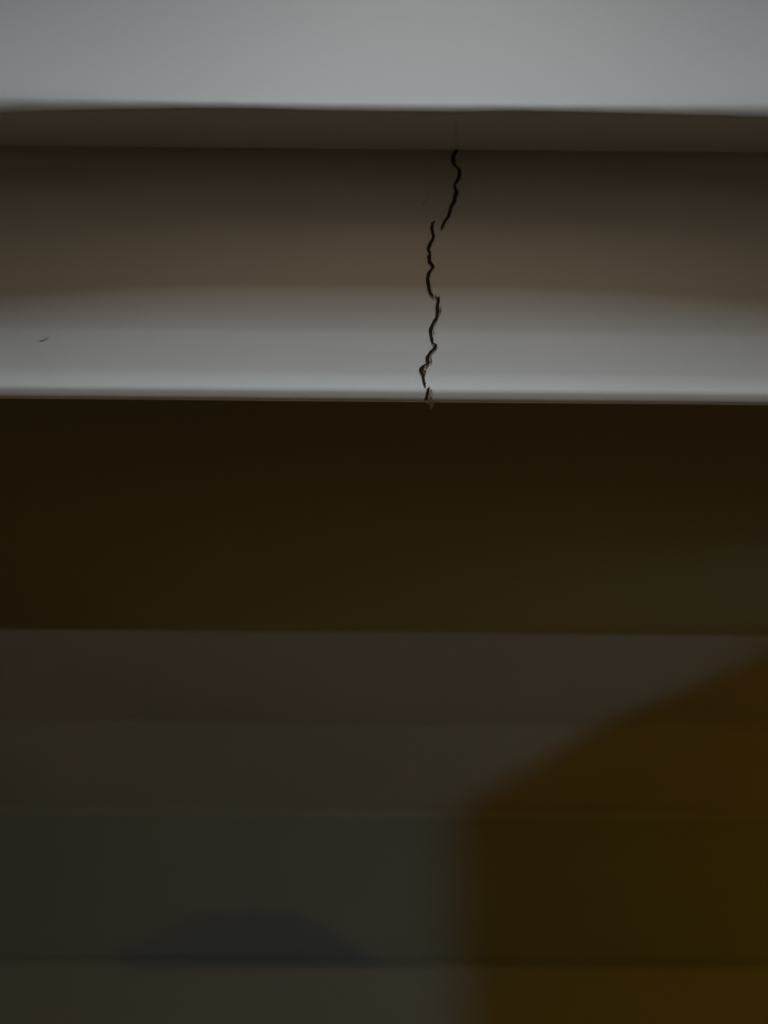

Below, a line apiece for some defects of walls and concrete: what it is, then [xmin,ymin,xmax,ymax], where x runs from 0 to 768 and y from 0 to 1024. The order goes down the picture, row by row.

crack [419,149,461,400]